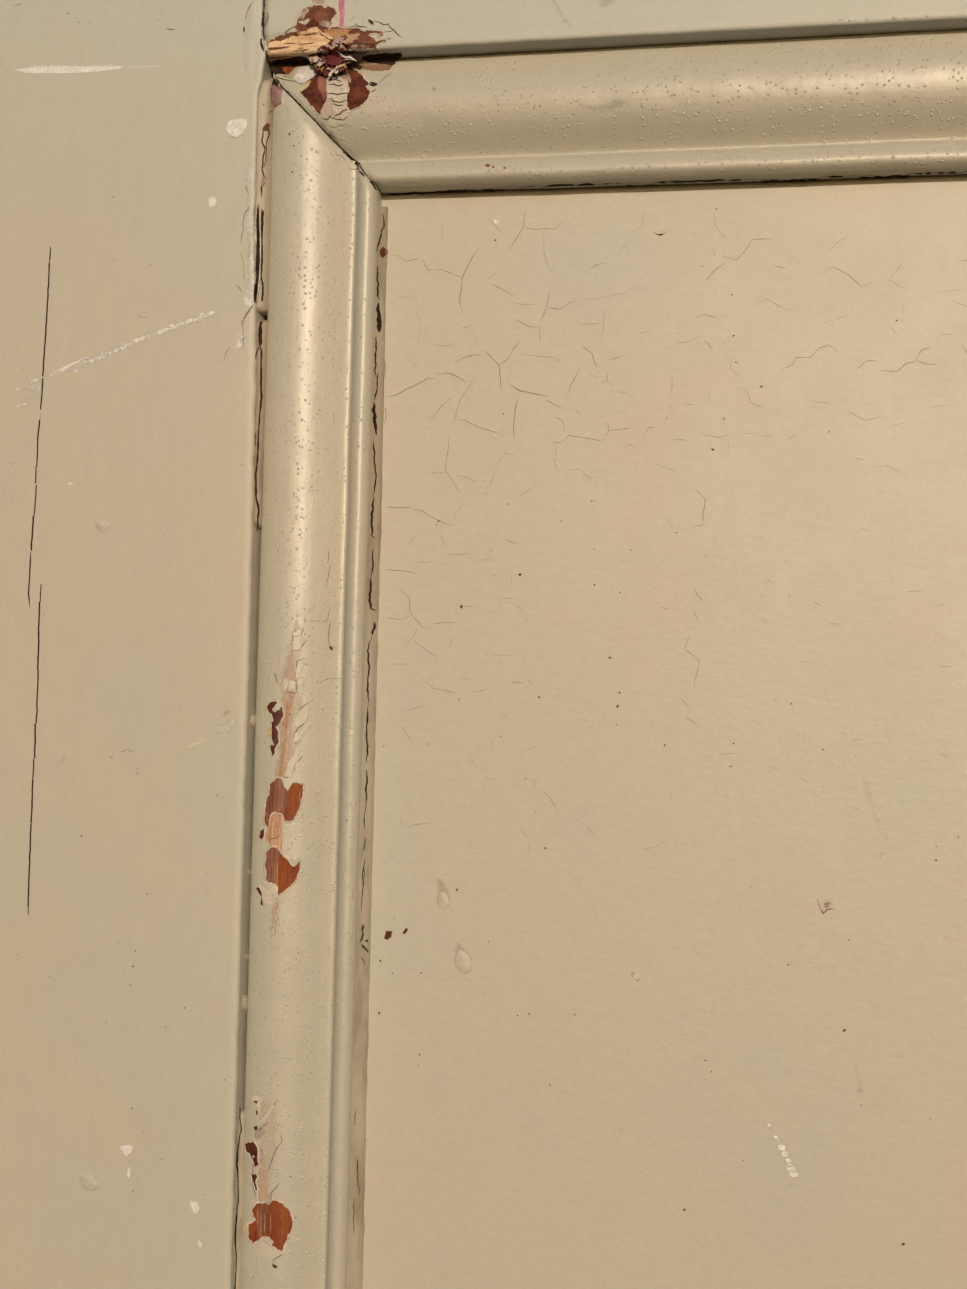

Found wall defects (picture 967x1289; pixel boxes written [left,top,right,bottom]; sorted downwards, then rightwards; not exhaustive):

peeling [268,14,402,127]
crack [223,122,270,531]
crack [27,246,51,915]
crack [260,6,967,963]
peeling [256,625,310,936]
peeling [242,1094,295,1278]
crack [352,1160,360,1233]